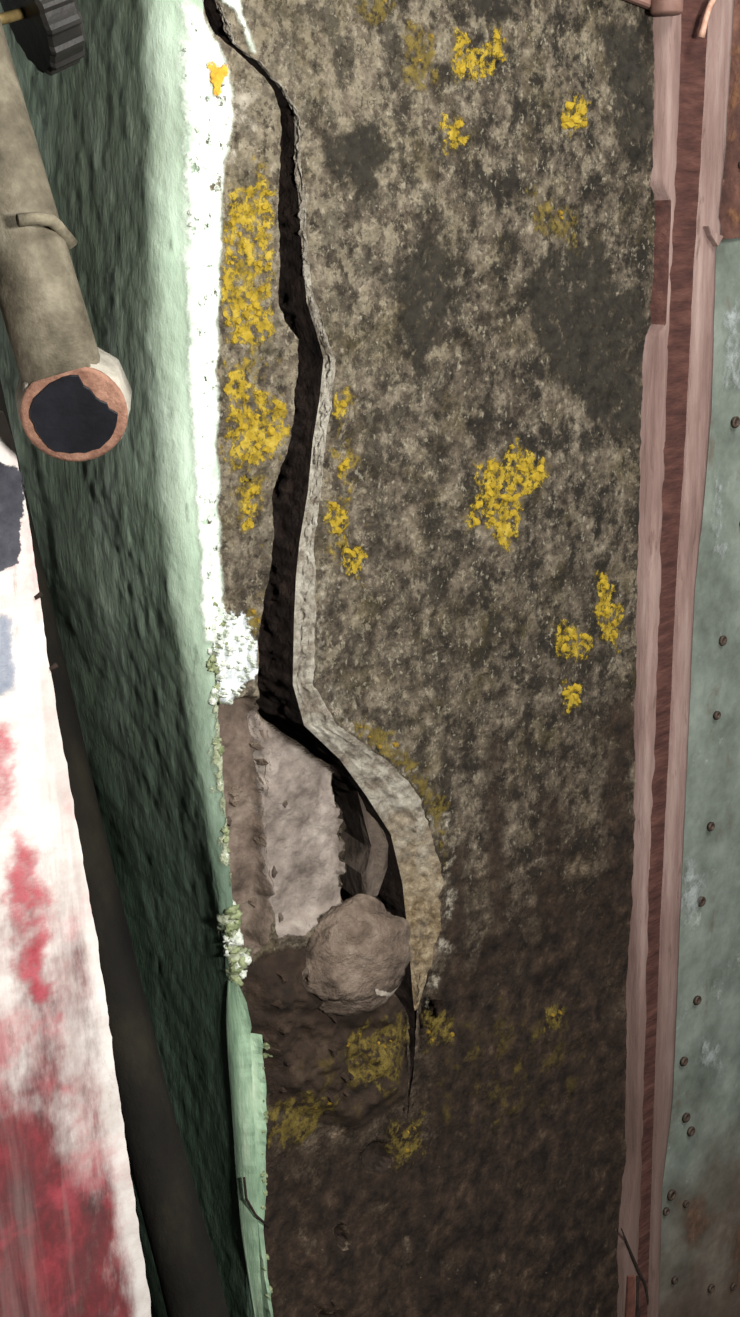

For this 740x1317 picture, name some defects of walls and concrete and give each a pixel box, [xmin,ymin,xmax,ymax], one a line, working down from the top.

leakage [212,611,258,705]
crack [203,0,452,1099]